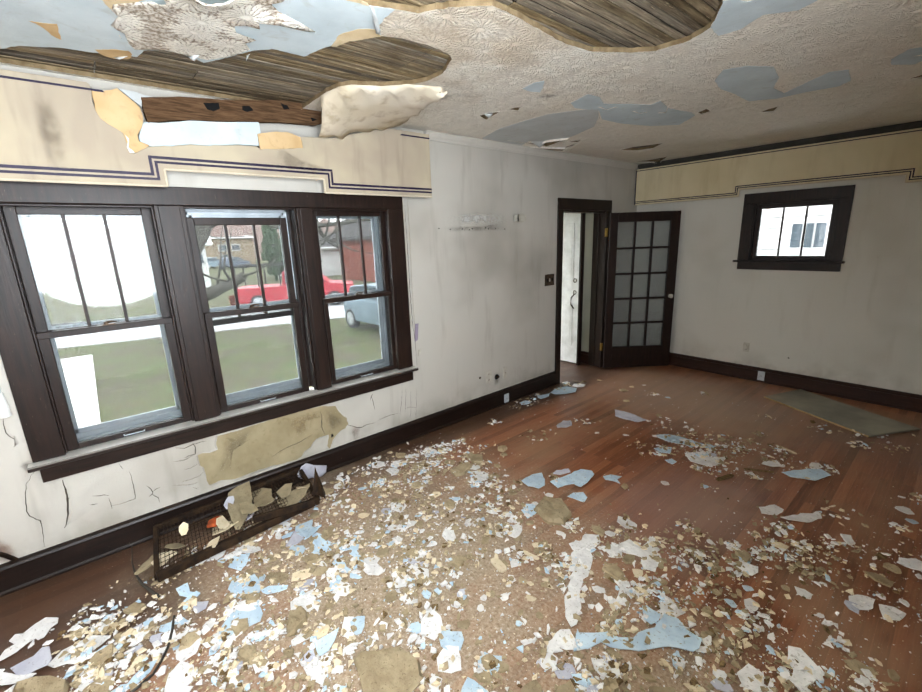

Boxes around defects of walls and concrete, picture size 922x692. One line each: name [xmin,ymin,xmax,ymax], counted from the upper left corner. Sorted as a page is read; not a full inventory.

peeling [0,0,166,59]
peeling [186,0,395,63]
peeling [711,0,817,36]
peeling [715,66,851,101]
peeling [92,88,303,153]
flaking render [196,405,349,499]
crack [25,472,70,542]
crack [91,467,160,507]